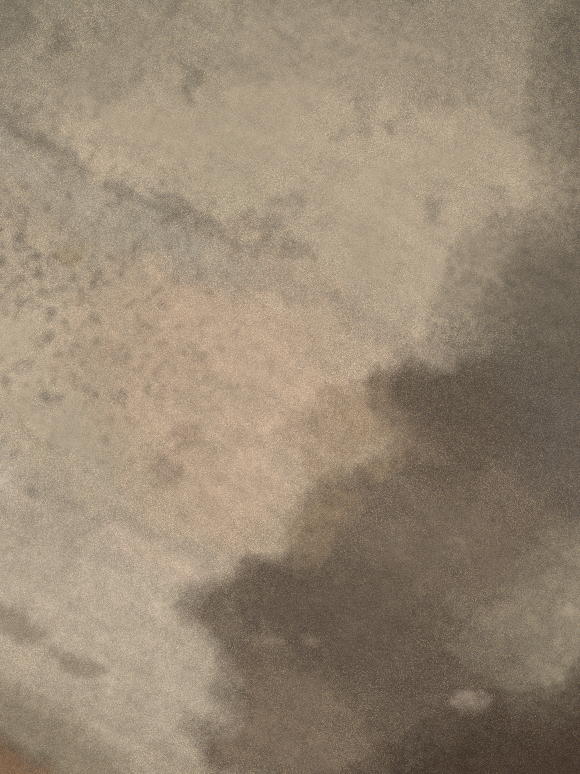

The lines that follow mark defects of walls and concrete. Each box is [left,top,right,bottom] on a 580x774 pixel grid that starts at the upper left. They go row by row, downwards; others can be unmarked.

water stain [0,675,144,774]